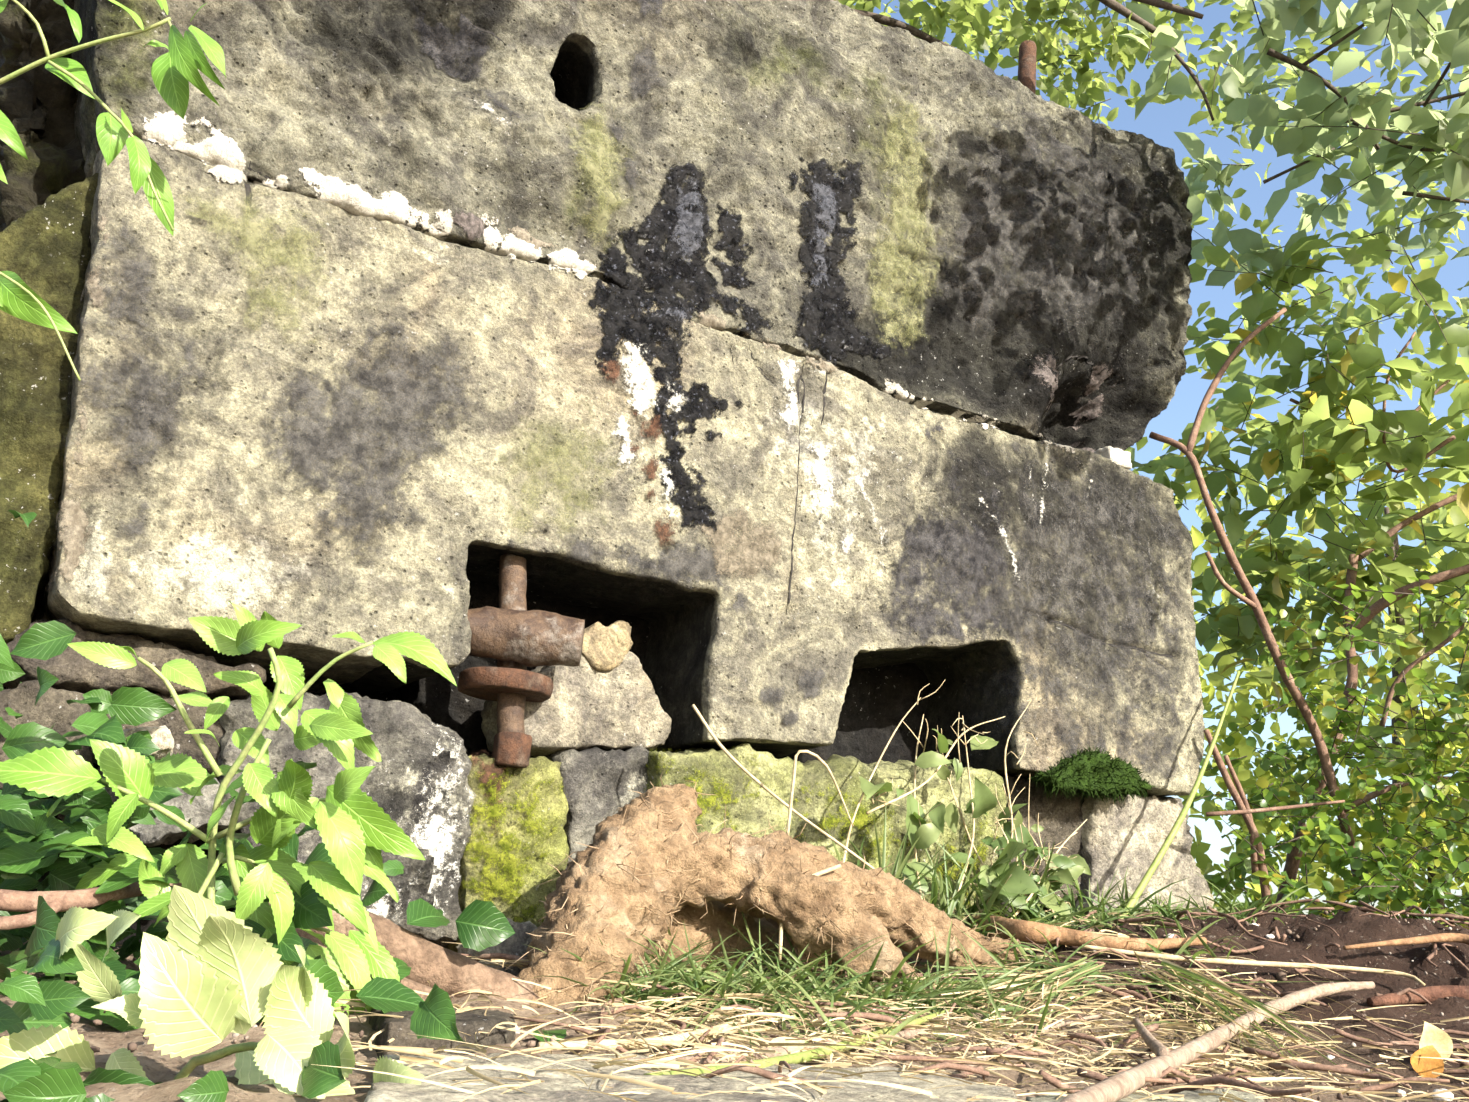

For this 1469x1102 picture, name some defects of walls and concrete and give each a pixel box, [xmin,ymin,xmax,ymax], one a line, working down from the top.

water stain [629,45,662,98]
water stain [570,101,941,533]